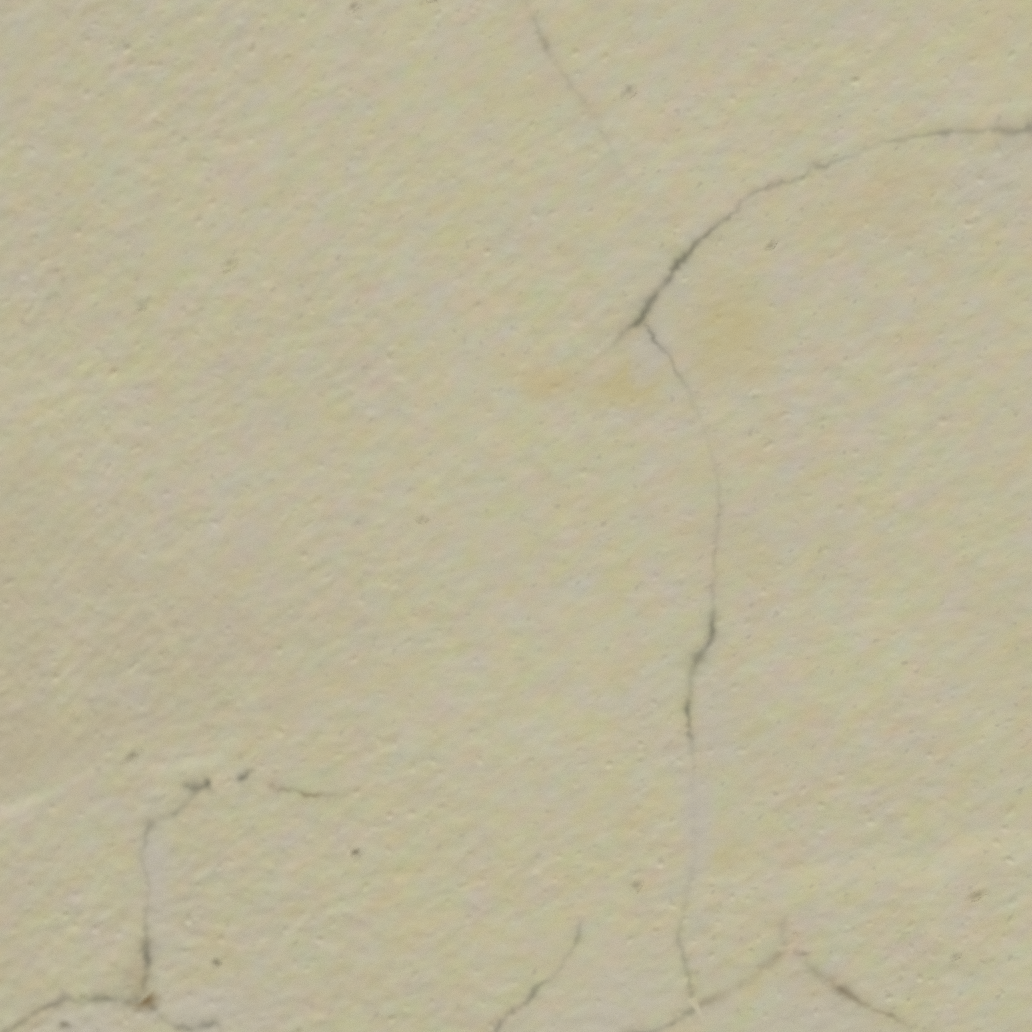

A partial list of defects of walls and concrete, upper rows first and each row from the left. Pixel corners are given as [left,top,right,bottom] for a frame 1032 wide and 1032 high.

crack [554,101,1032,1032]
crack [124,759,352,977]
crack [0,979,231,1032]